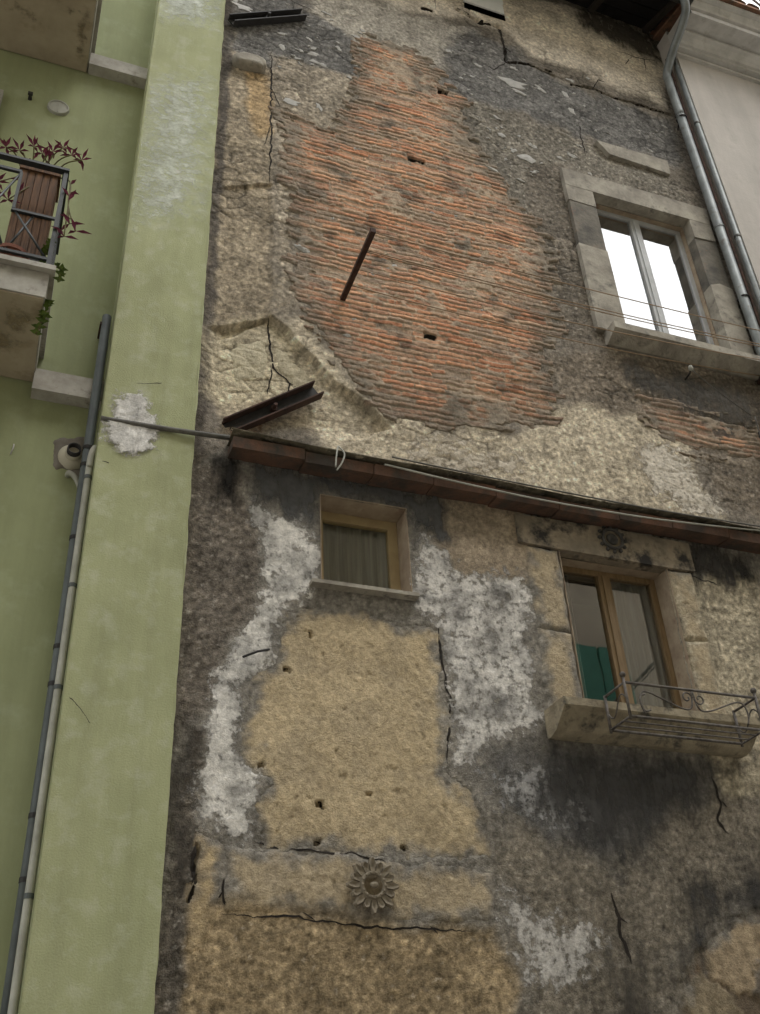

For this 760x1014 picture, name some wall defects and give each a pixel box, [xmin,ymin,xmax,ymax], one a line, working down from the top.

flaking render [277,16,328,69]
crack [435,3,664,113]
flaking render [550,78,595,126]
spalling [267,28,582,487]
crack [267,318,296,395]
spalling [177,496,594,955]
crack [188,845,197,903]
crack [256,842,384,861]
crack [219,878,471,933]